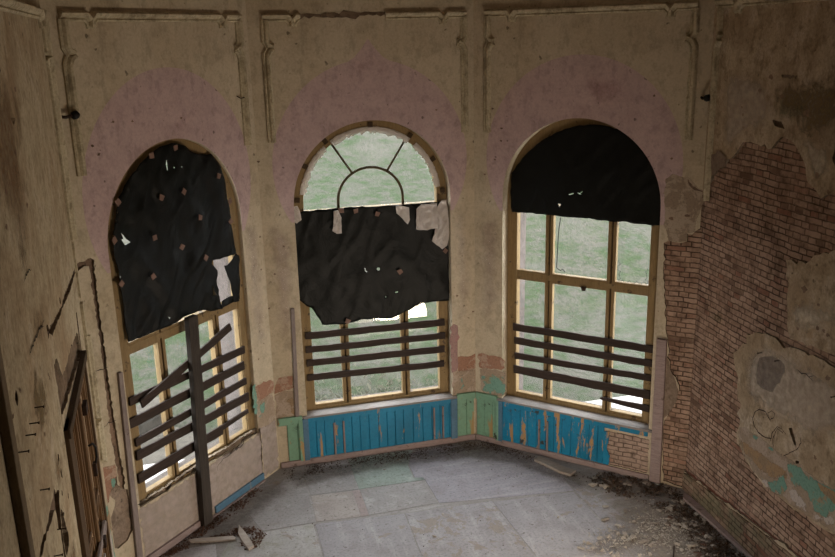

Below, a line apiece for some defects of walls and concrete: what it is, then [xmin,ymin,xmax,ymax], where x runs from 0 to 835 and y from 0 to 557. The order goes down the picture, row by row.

peeling [449,324,507,396]
flaking render [662,120,835,557]
peeling [208,376,295,459]